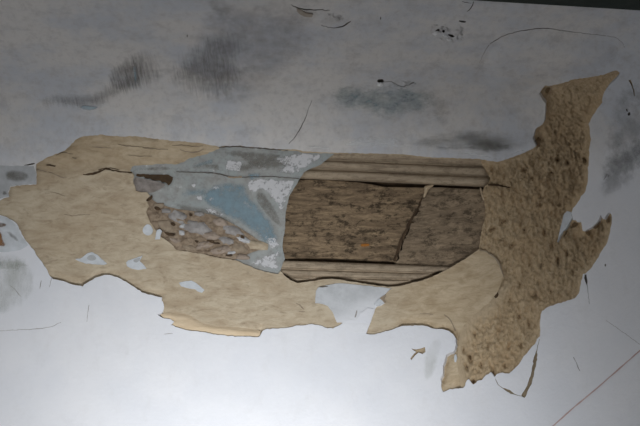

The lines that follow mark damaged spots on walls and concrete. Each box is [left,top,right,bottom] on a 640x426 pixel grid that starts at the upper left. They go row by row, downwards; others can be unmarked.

crack [479,28,620,63]
flaking render [0,71,619,392]
crack [393,198,422,261]